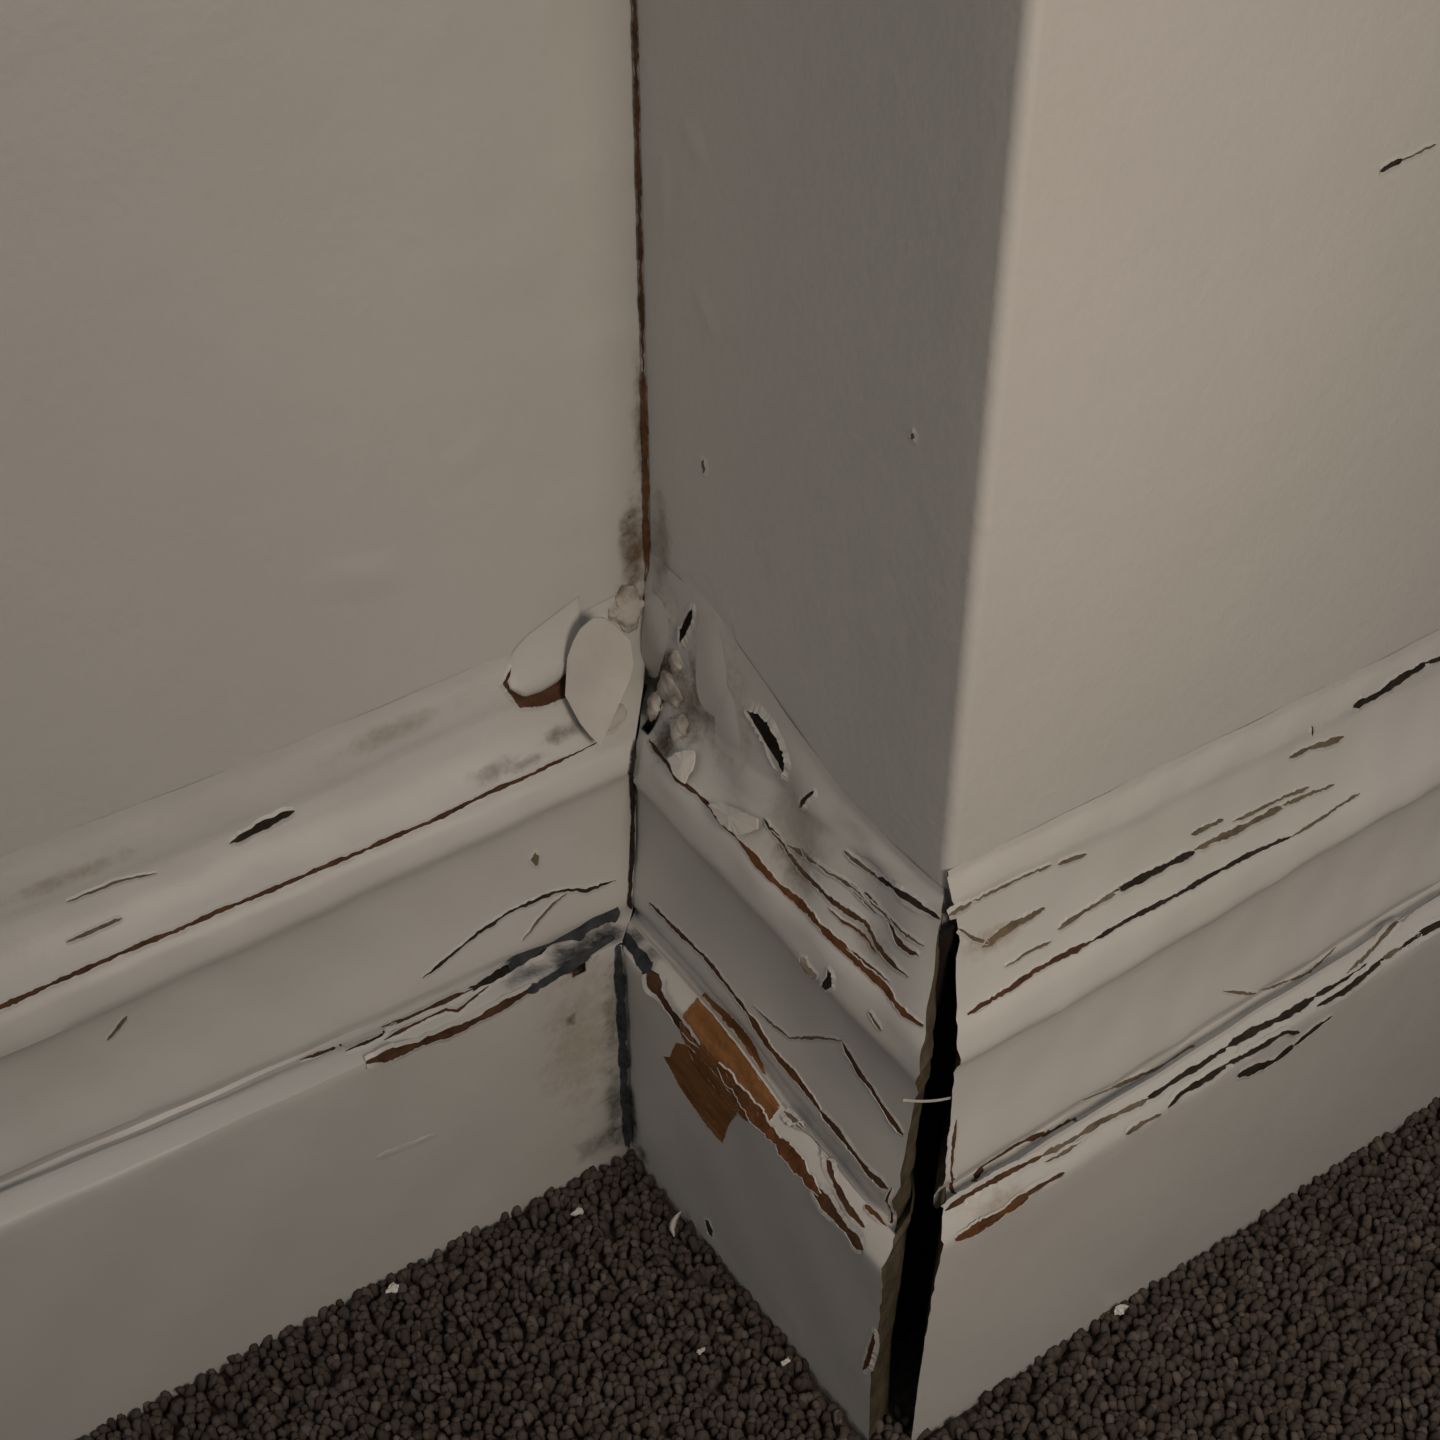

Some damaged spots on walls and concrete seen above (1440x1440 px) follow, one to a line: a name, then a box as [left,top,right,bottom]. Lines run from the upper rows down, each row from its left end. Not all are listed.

spalling [498,564,793,835]
peeling [527,848,542,870]
crack [0,652,1440,1255]
peeling [798,953,836,994]
peeling [663,992,784,1144]